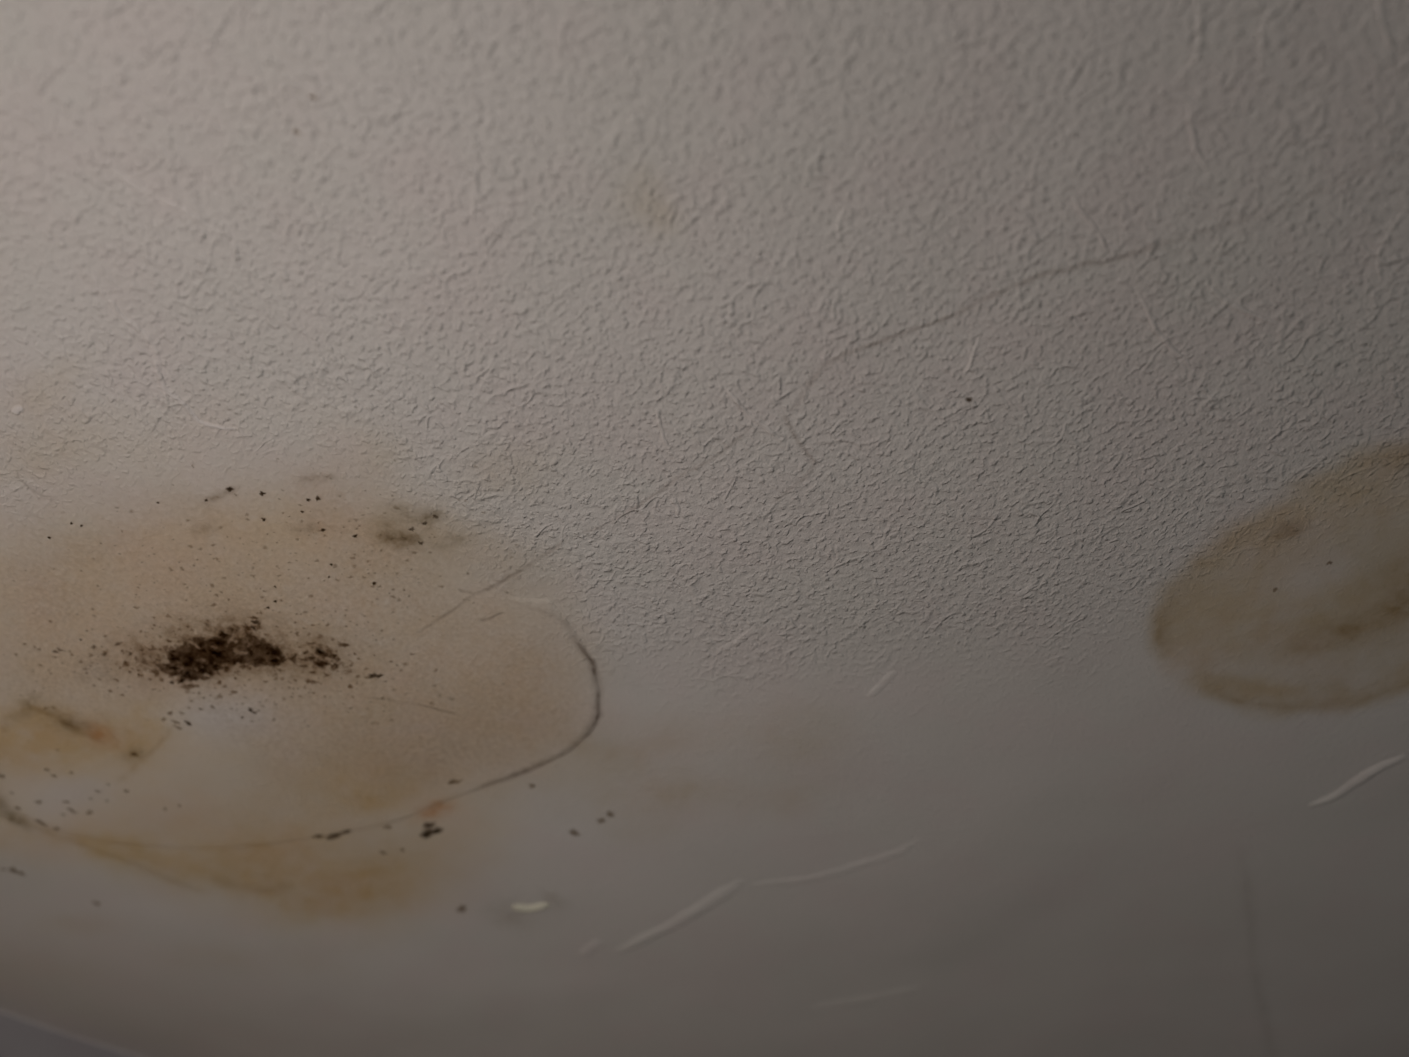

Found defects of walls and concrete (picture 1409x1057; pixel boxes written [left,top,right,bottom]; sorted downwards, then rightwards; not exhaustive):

leakage [157,586,284,687]